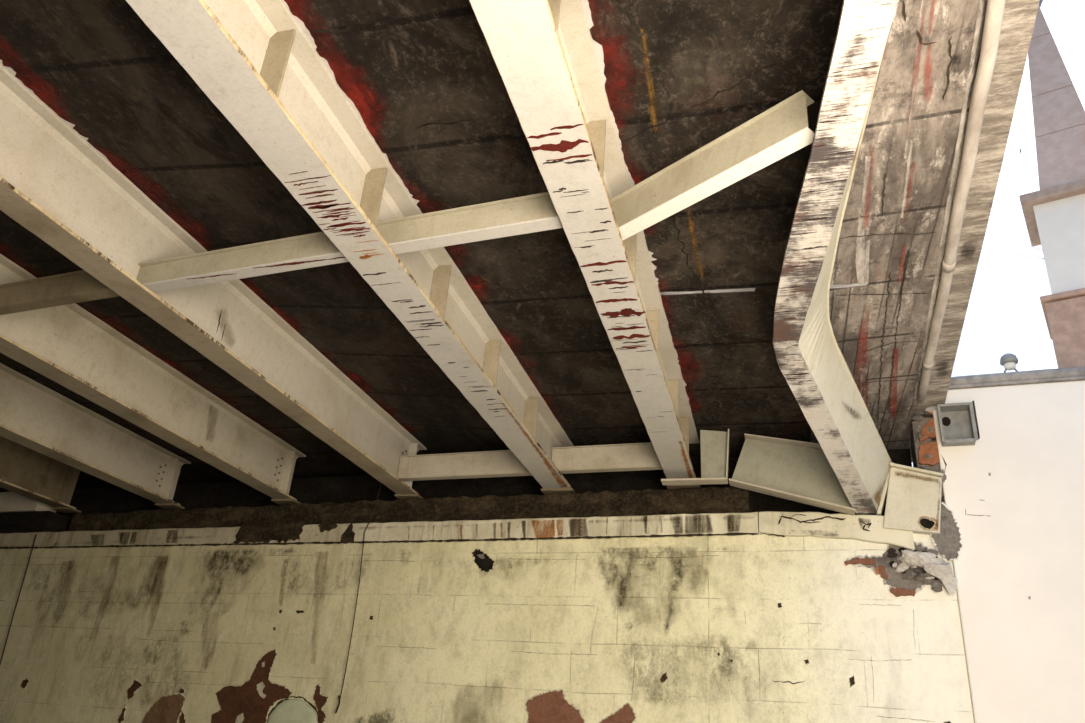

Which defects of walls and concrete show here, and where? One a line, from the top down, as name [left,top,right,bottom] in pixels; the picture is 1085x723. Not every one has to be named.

crack [902,0,953,101]
crack [759,514,871,537]
water stain [208,550,254,593]
hole [472,548,495,573]
water stain [600,549,638,606]
water stain [661,548,683,628]
spalling [844,542,957,597]
peeling [141,688,187,723]
peeling [211,648,293,723]
peeling [313,683,328,723]
peeling [525,689,586,723]
peeling [599,703,637,723]